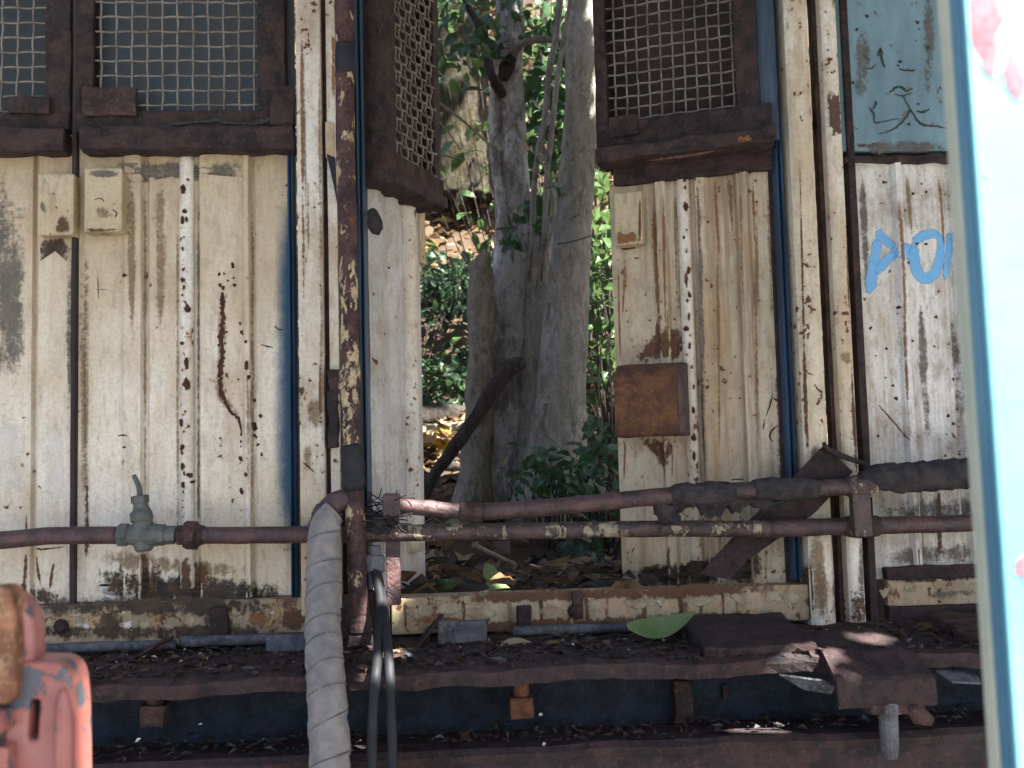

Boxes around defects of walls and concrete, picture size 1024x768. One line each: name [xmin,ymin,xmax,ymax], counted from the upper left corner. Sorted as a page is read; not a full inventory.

water stain [0,189,24,369]
corrosion [617,200,683,362]
corrosion [714,181,755,285]
corrosion [80,290,89,526]
corrosion [238,361,263,456]
corrosion [643,438,677,478]
corrosion [112,553,227,592]
peeling [436,602,496,620]
peeling [683,595,715,606]
peeling [933,579,949,590]